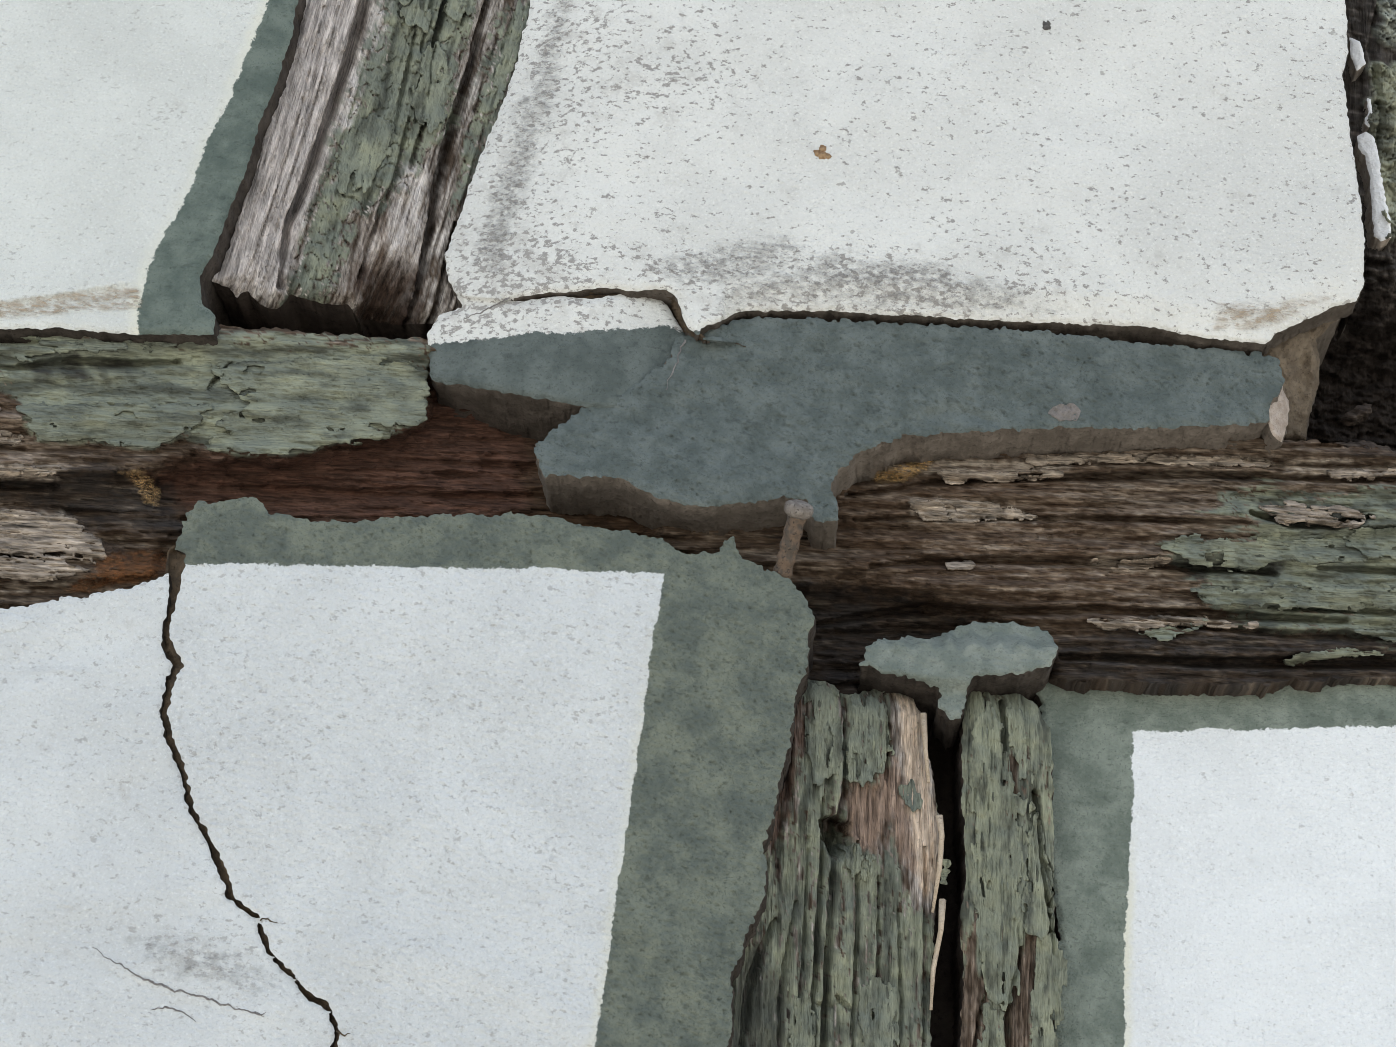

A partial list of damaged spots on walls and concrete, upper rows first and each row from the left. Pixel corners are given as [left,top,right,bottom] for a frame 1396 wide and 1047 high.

peeling [493,0,530,109]
peeling [1346,38,1366,82]
peeling [1353,98,1391,263]
crack [464,292,618,319]
crack [666,296,707,390]
peeling [16,354,430,456]
spalling [1261,386,1289,453]
peeling [1138,527,1396,641]
peeling [801,682,895,787]
crack [162,545,350,1047]
peeling [968,701,1068,1047]
crack [92,947,266,1022]